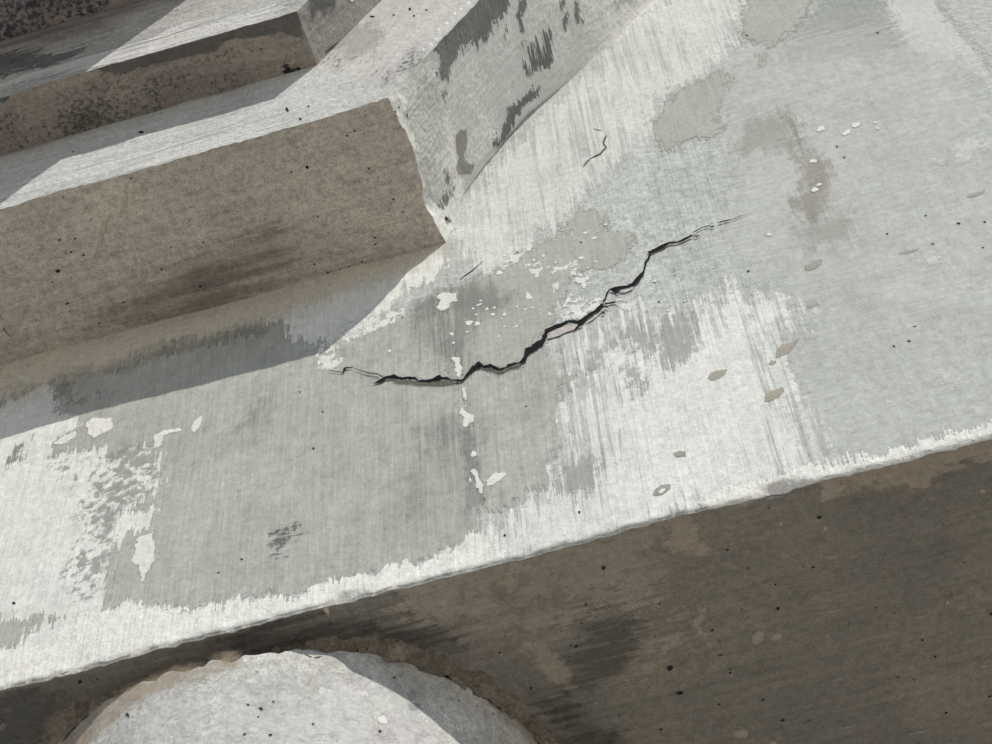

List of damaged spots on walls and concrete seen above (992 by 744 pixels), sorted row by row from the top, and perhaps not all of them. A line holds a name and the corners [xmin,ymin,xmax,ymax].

crack [329,215,743,385]